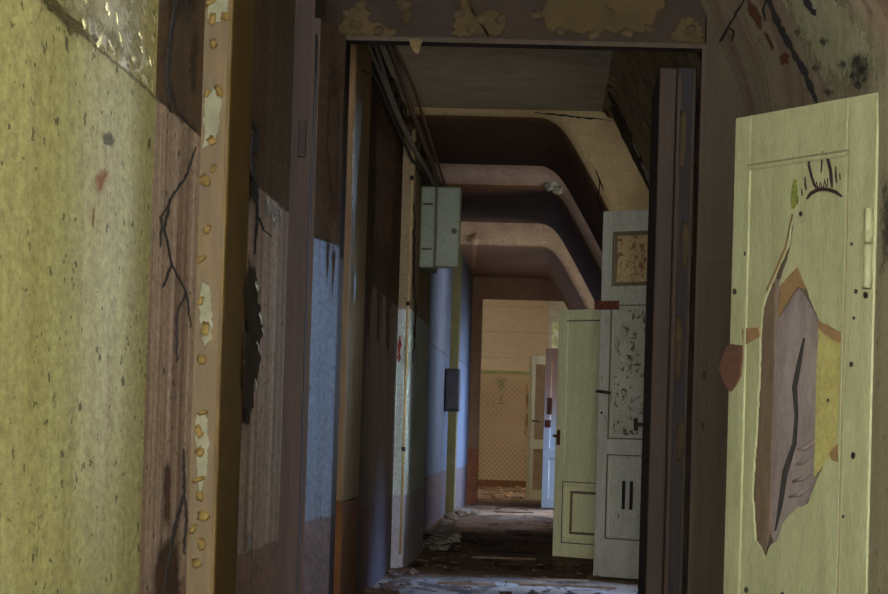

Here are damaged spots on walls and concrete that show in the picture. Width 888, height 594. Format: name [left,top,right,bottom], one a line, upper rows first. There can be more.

peeling [43,0,152,69]
peeling [529,0,667,41]
crack [719,0,818,103]
water stain [781,0,884,96]
crack [159,0,197,362]
peeling [197,281,214,365]
crack [163,449,188,594]
peeling [189,410,210,568]